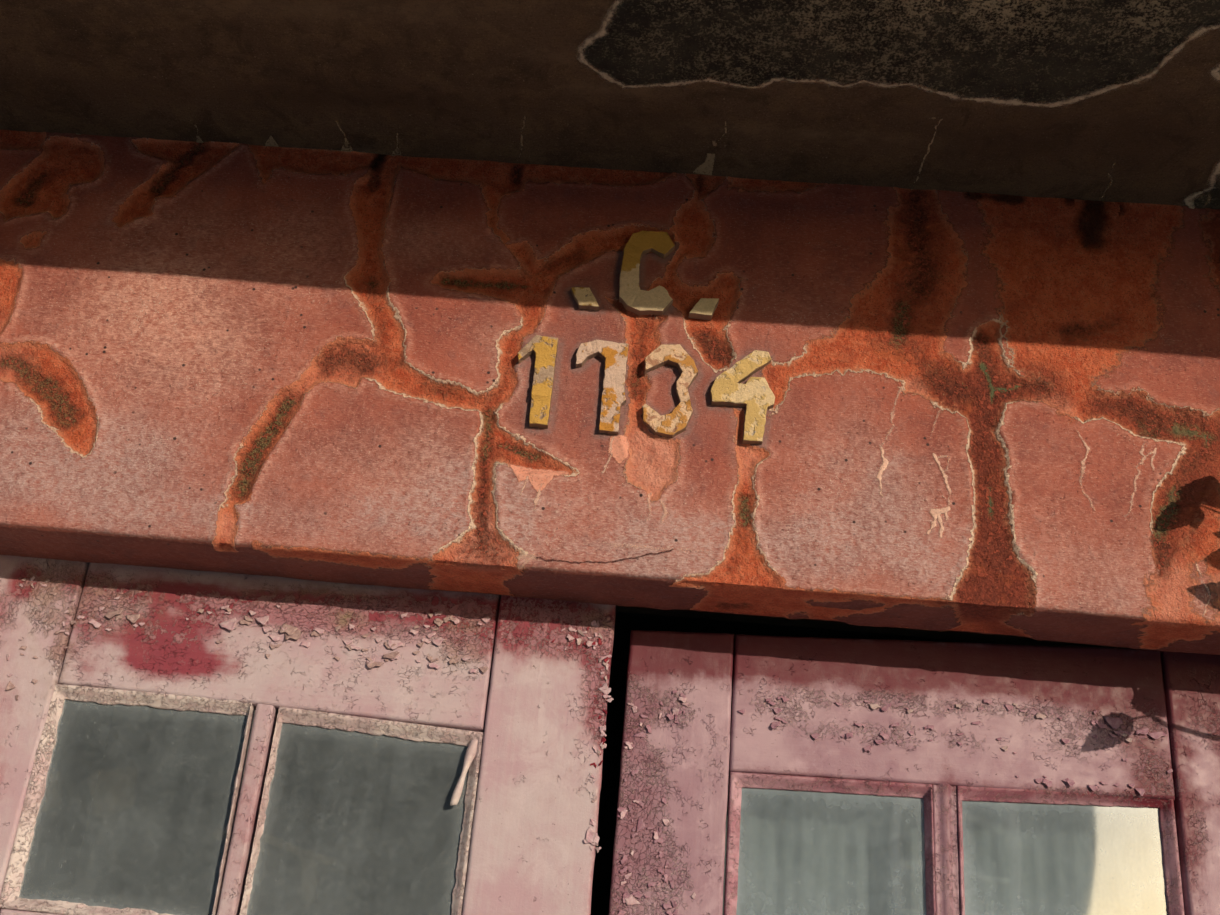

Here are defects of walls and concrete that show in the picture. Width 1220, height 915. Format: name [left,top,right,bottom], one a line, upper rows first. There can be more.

crack [212,116,1220,625]
peeling [55,596,145,648]
peeling [186,605,489,673]
peeling [1091,710,1167,742]